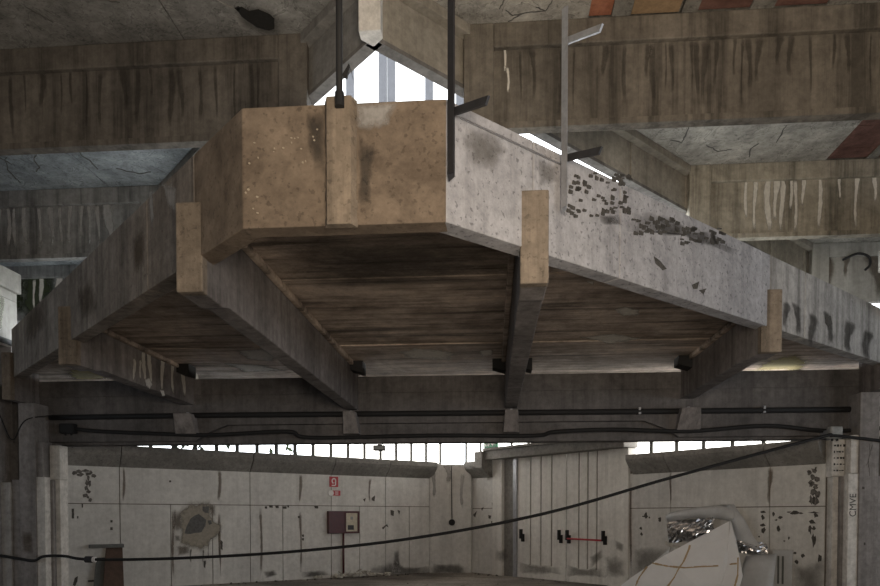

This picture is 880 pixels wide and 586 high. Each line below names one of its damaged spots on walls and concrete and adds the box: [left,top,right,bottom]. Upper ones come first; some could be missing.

crack [499,0,553,22]
crack [80,153,151,174]
leakage [37,205,113,244]
peeling [566,172,726,246]
leakage [744,180,806,228]
peeling [72,469,96,519]
spalling [185,506,212,534]
peeling [758,467,822,562]